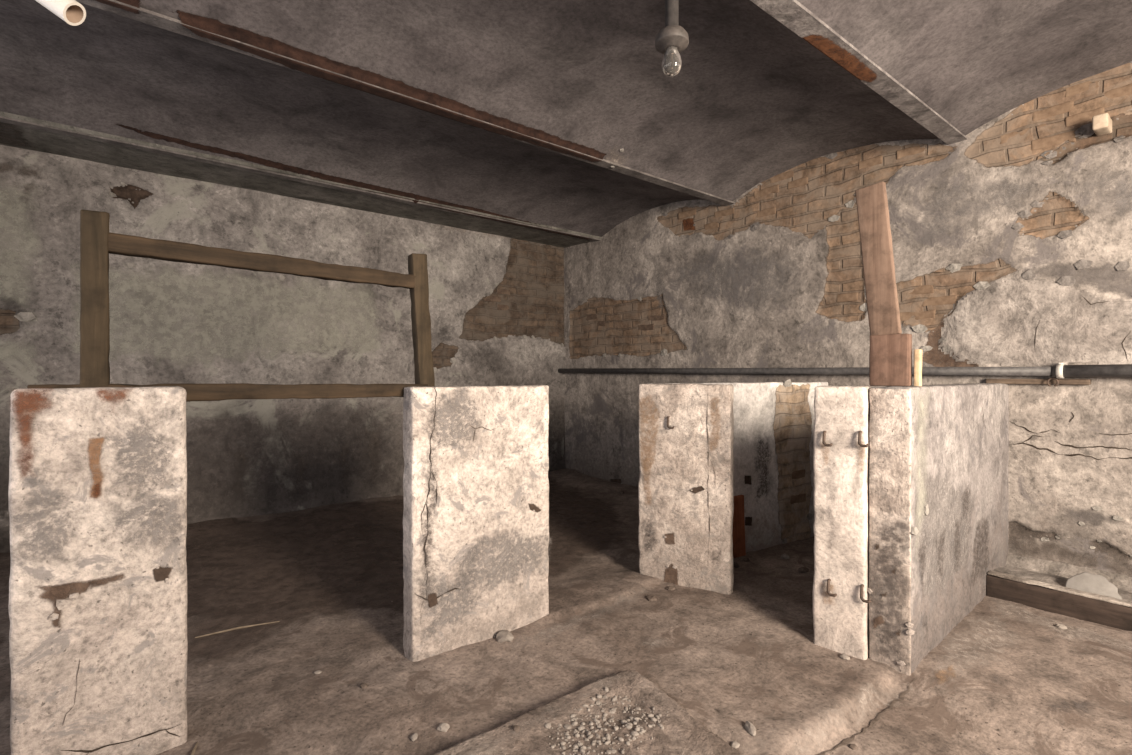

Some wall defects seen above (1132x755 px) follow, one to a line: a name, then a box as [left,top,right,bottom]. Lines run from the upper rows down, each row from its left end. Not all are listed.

corrosion [803,35,877,82]
spalling [109,182,153,209]
flaking render [657,62,1132,322]
peeling [0,190,38,360]
spalling [432,233,687,373]
spalling [896,258,1132,367]
corrosion [13,390,50,470]
corrosion [88,438,104,498]
crack [1013,412,1132,460]
spalling [40,574,124,628]
spalling [153,567,172,582]
crack [60,660,180,755]